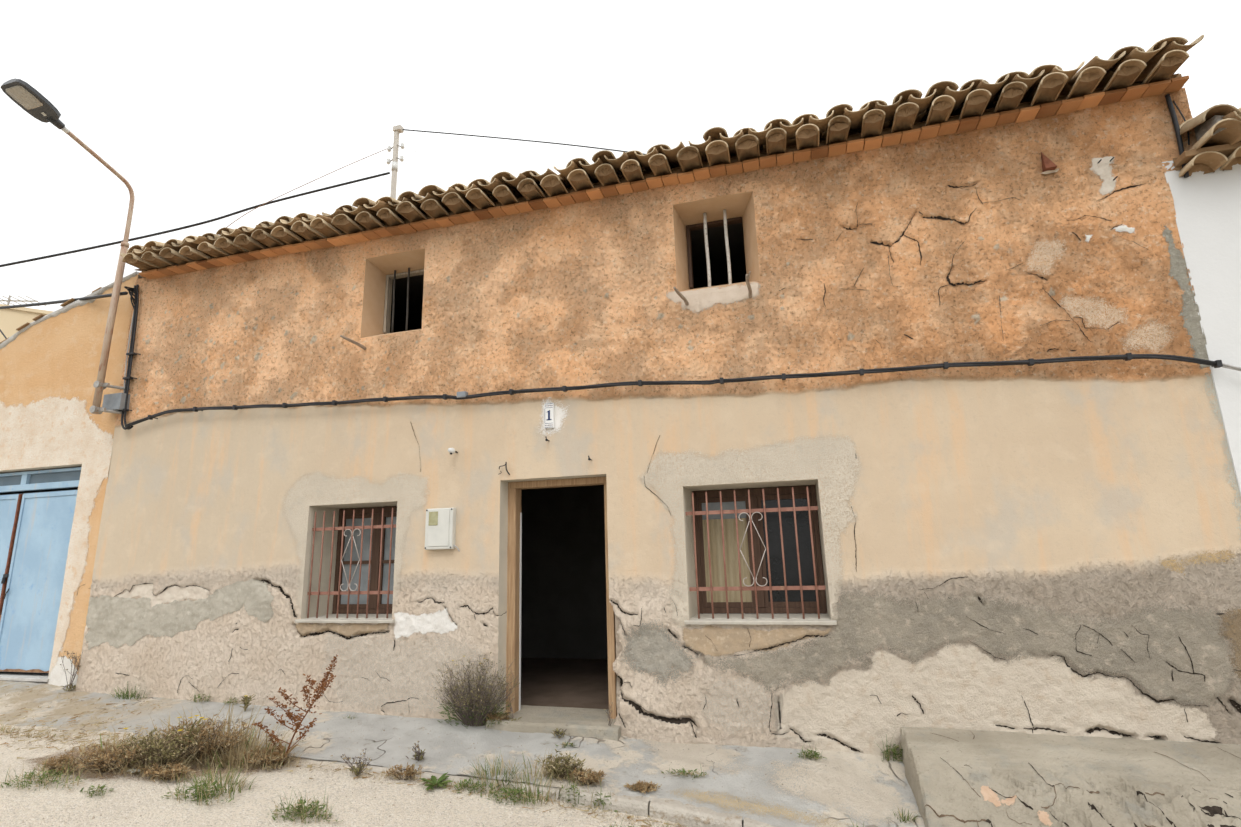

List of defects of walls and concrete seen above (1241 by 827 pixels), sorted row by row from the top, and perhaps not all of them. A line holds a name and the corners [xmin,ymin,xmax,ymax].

crack [801,183,1119,351]
crack [1072,184,1147,249]
flaking render [0,396,113,677]
flaking render [116,582,209,607]
flaking render [295,623,496,717]
flaking render [682,625,833,657]
flaking render [700,642,1218,756]
crack [870,577,1241,827]